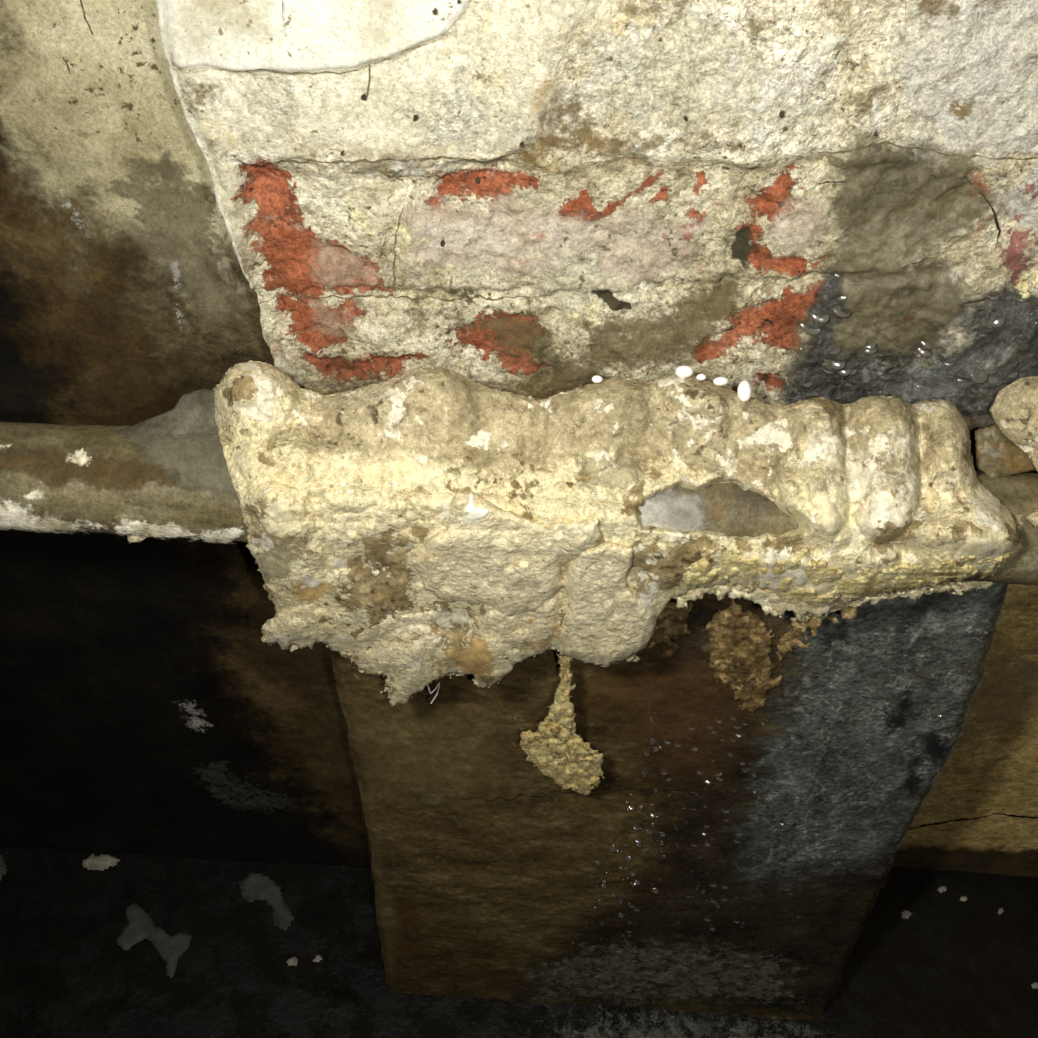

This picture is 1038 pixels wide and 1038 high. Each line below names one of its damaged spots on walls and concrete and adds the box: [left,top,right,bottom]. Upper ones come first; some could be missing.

damp [0,133,239,426]
damp [240,71,300,129]
spalling [176,0,1038,405]
damp [891,0,1038,167]
damp [0,527,369,867]
damp [213,135,1038,1015]
crack [908,813,1038,830]